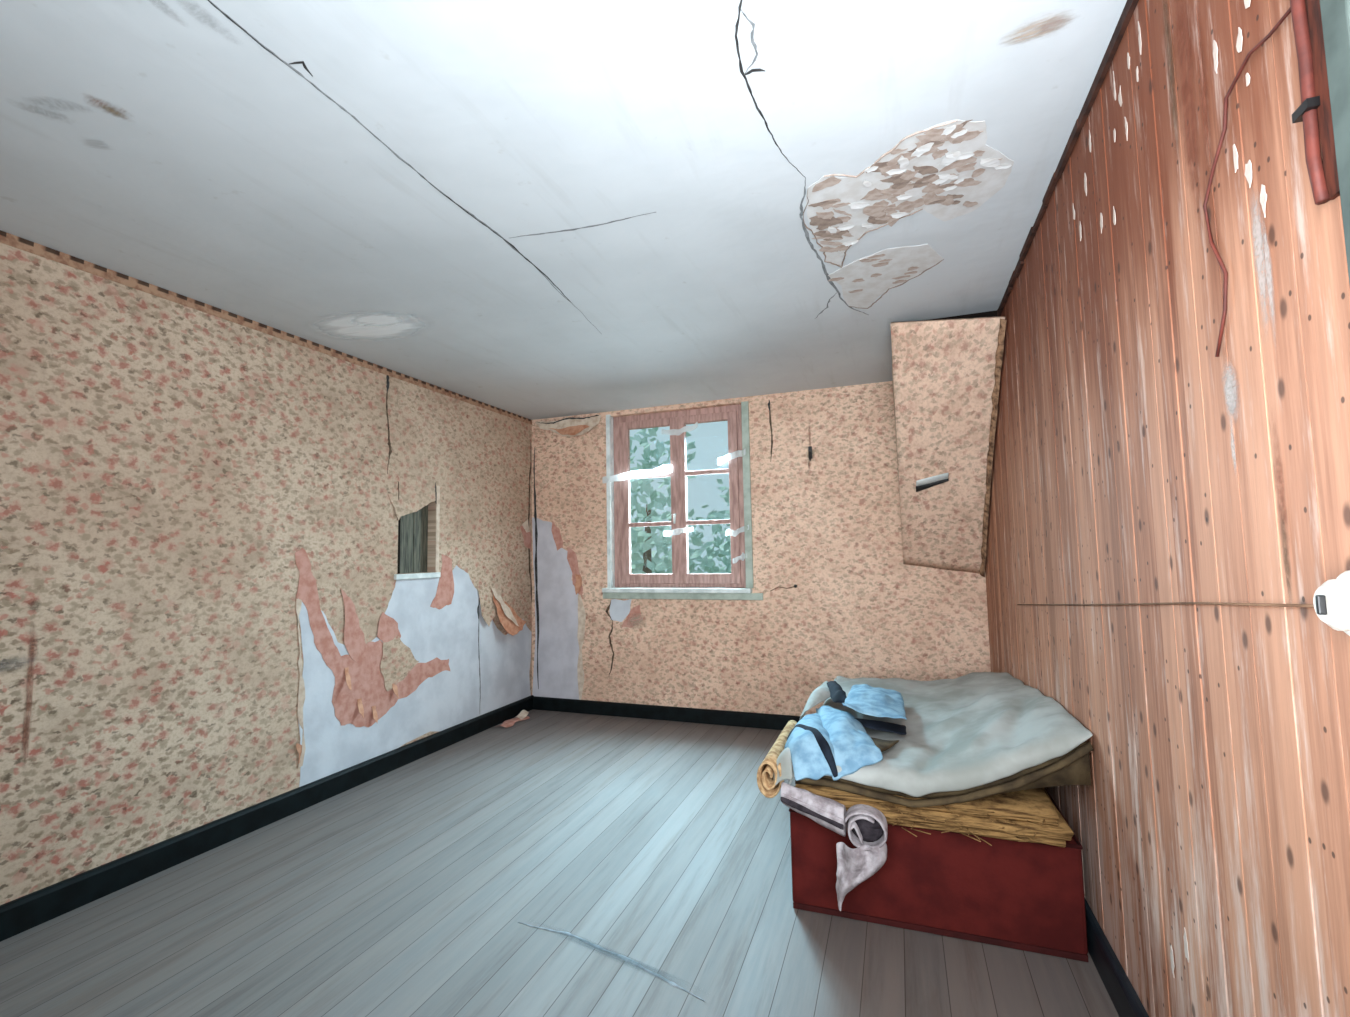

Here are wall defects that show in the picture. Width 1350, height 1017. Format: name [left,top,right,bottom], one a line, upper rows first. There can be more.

crack [208,0,656,330]
crack [735,0,868,318]
flaking render [803,120,1014,309]
peeling [295,517,586,787]